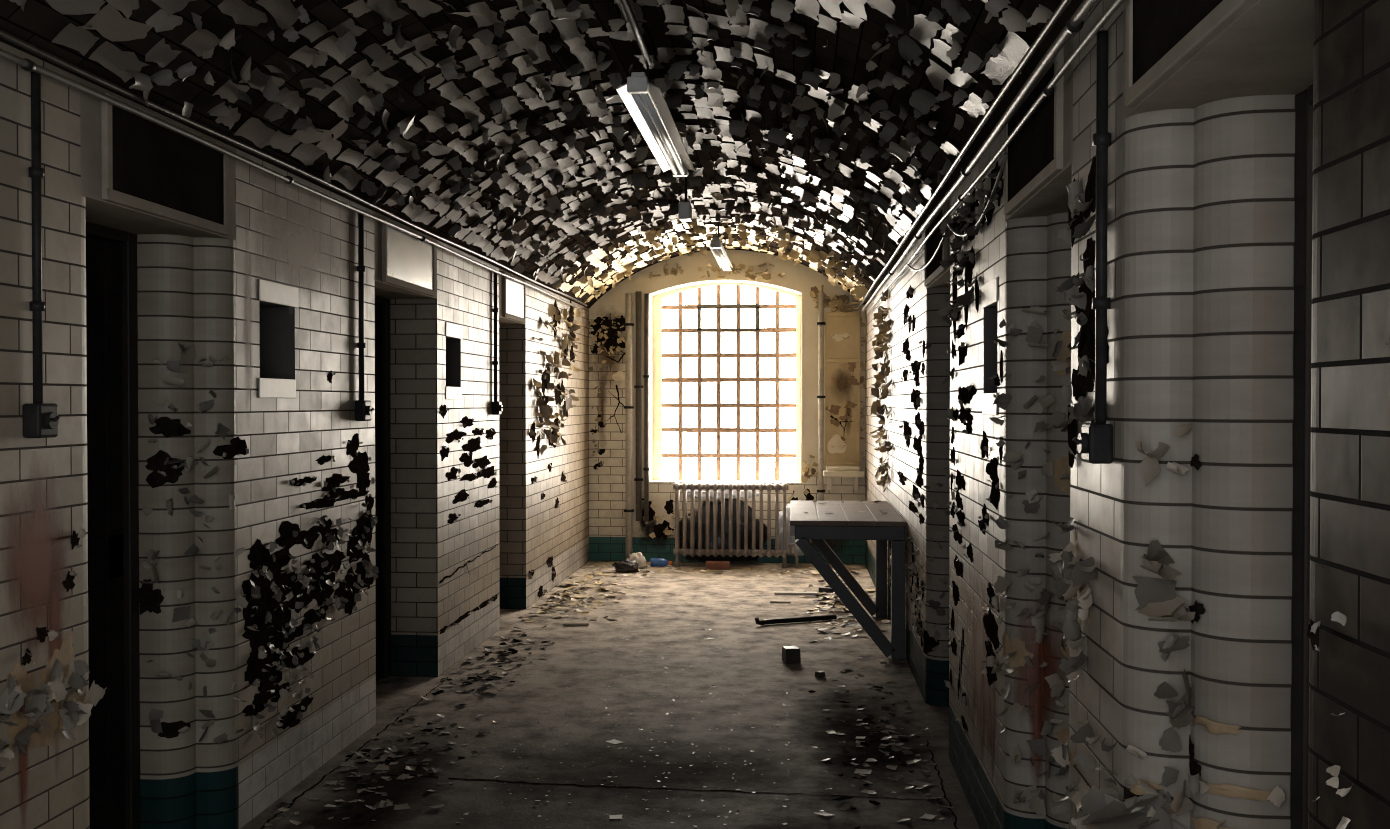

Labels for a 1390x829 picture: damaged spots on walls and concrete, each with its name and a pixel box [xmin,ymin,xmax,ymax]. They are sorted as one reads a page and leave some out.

peeling [46,0,1096,745]
peeling [0,626,107,771]
peeling [981,517,1285,829]